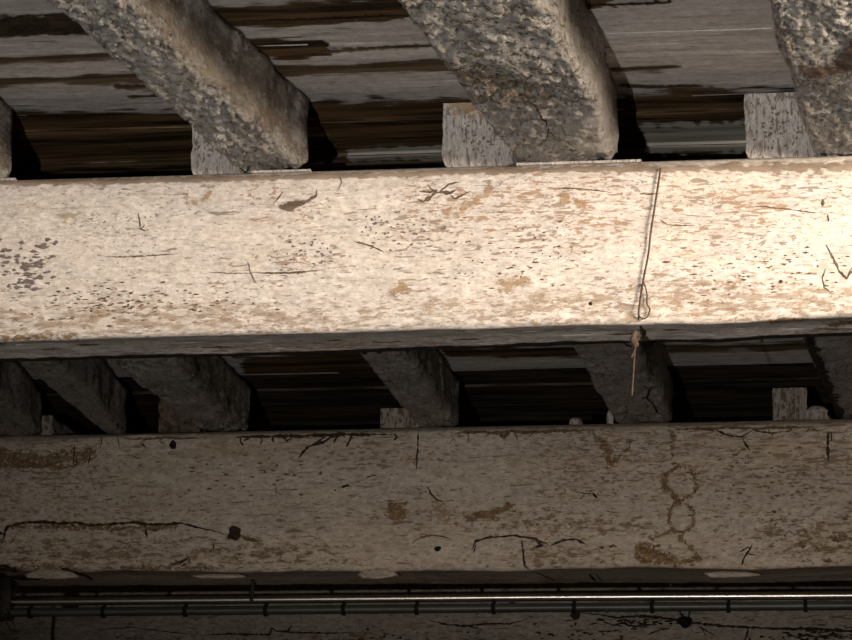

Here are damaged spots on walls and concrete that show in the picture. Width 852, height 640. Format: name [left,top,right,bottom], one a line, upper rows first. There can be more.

crack [235,430,419,469]
crack [0,520,258,548]
crack [472,534,588,582]
crack [579,611,852,640]